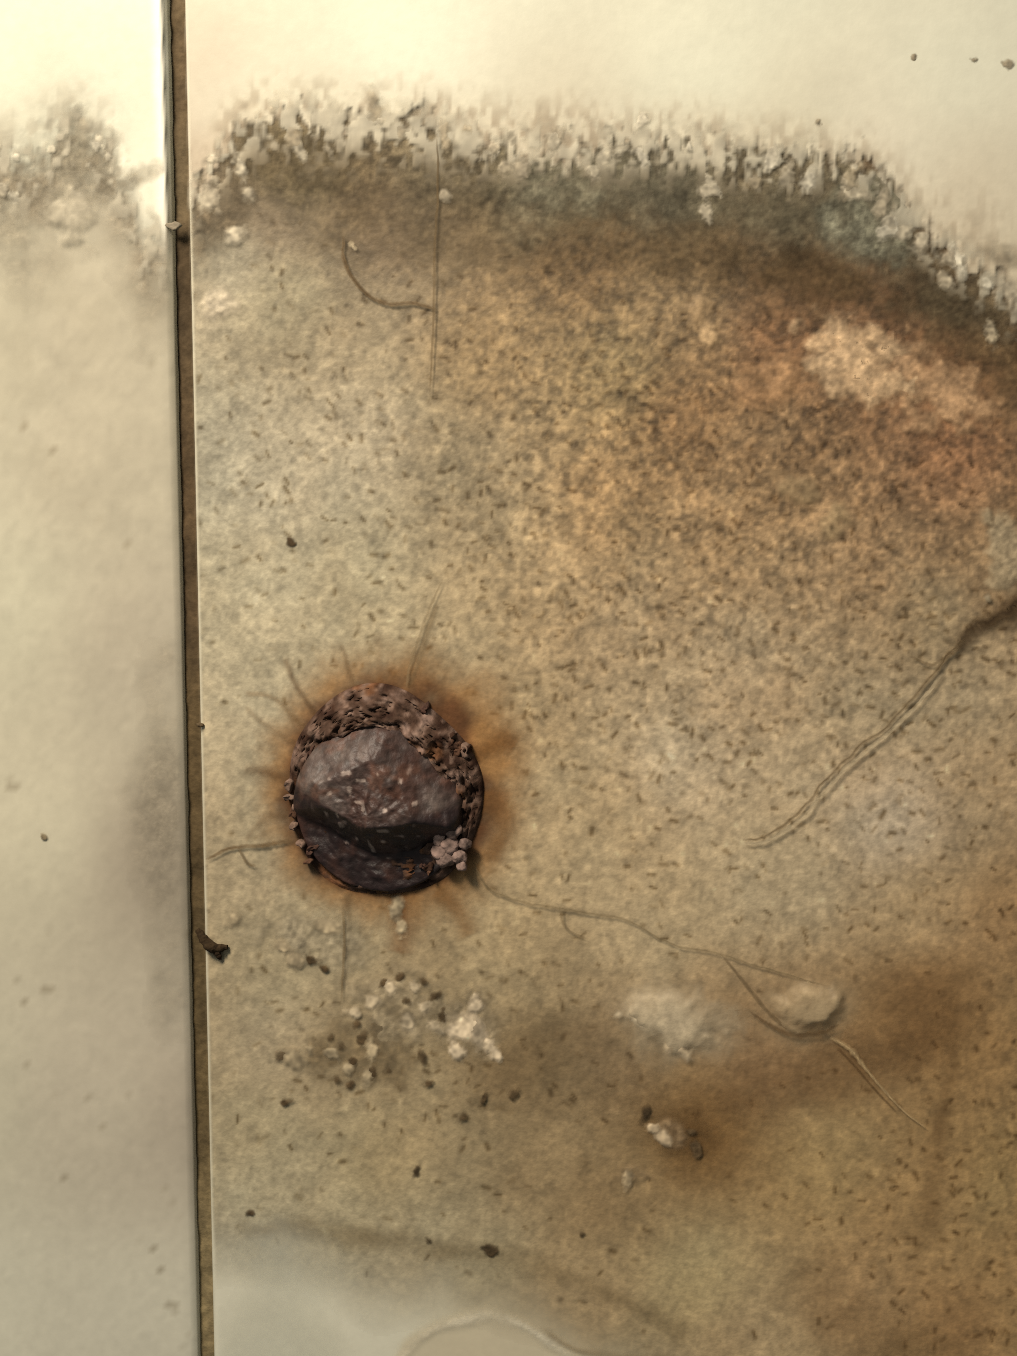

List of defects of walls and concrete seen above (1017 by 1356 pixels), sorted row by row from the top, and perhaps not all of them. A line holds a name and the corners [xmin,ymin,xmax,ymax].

damp [0,128,126,216]
corrosion [270,665,511,913]
damp [191,105,1017,1356]
crack [748,595,1017,845]